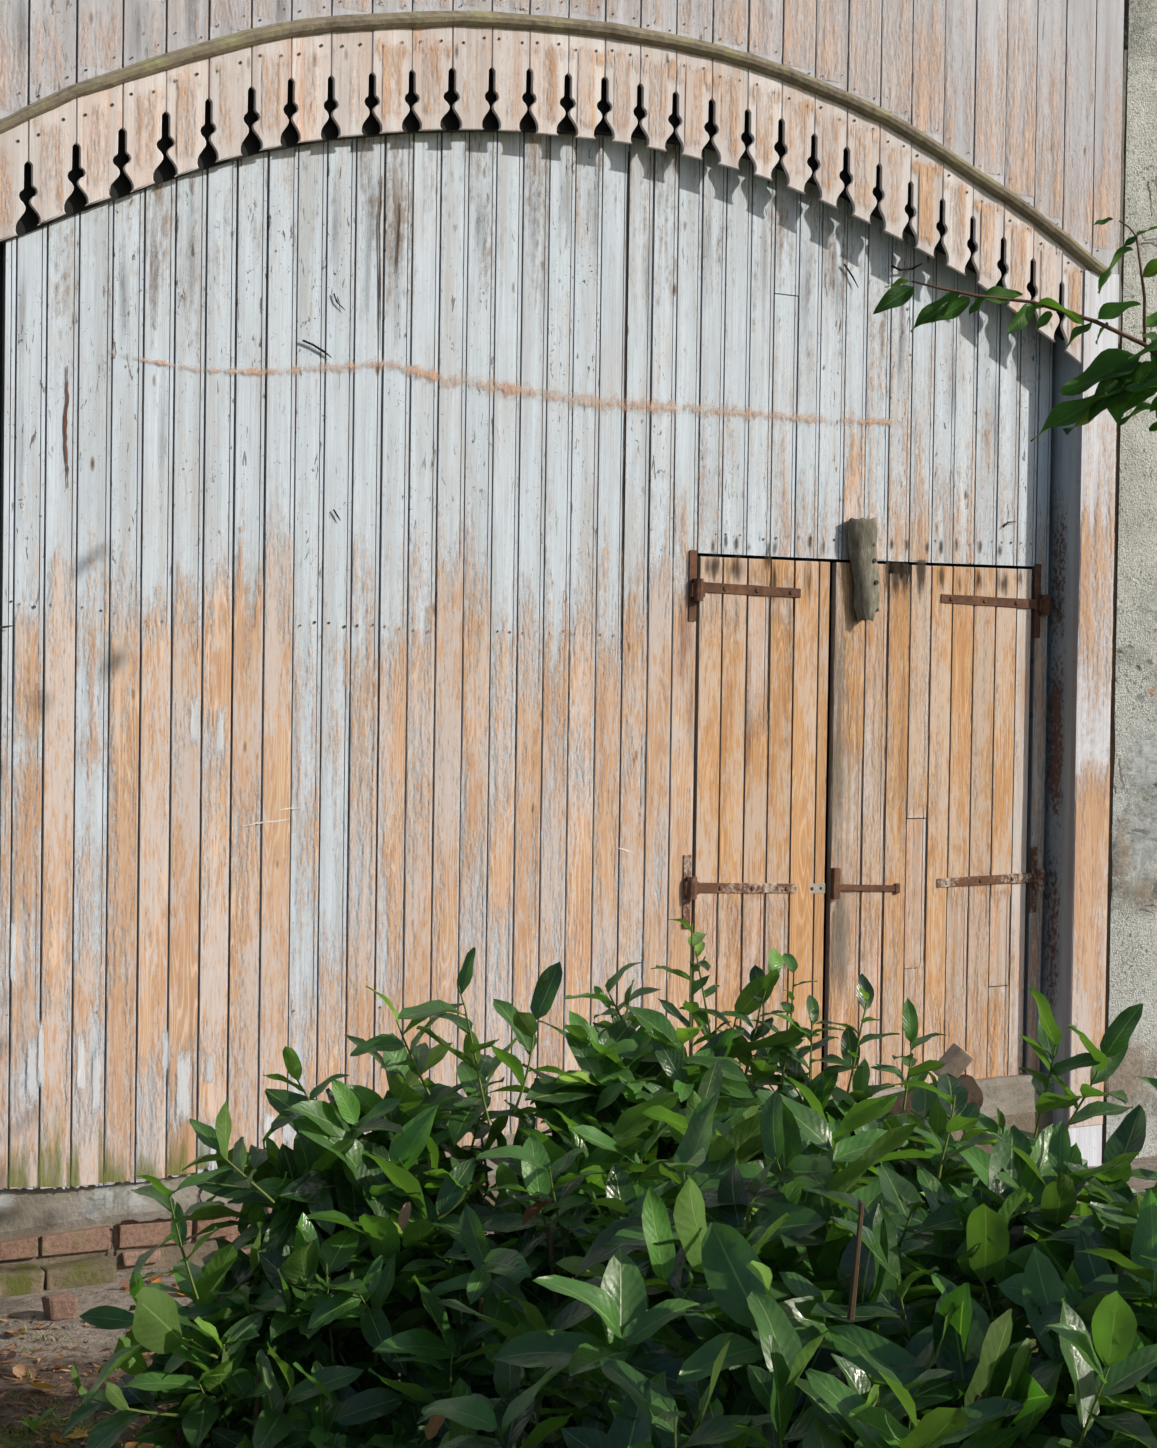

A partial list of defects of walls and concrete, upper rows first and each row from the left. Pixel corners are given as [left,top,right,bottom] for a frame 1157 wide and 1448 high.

peeling [0,24,60,109]
peeling [196,0,281,36]
peeling [703,0,1121,248]
peeling [0,38,1082,1217]
rust [1047,491,1067,827]
rust [1044,850,1060,1016]